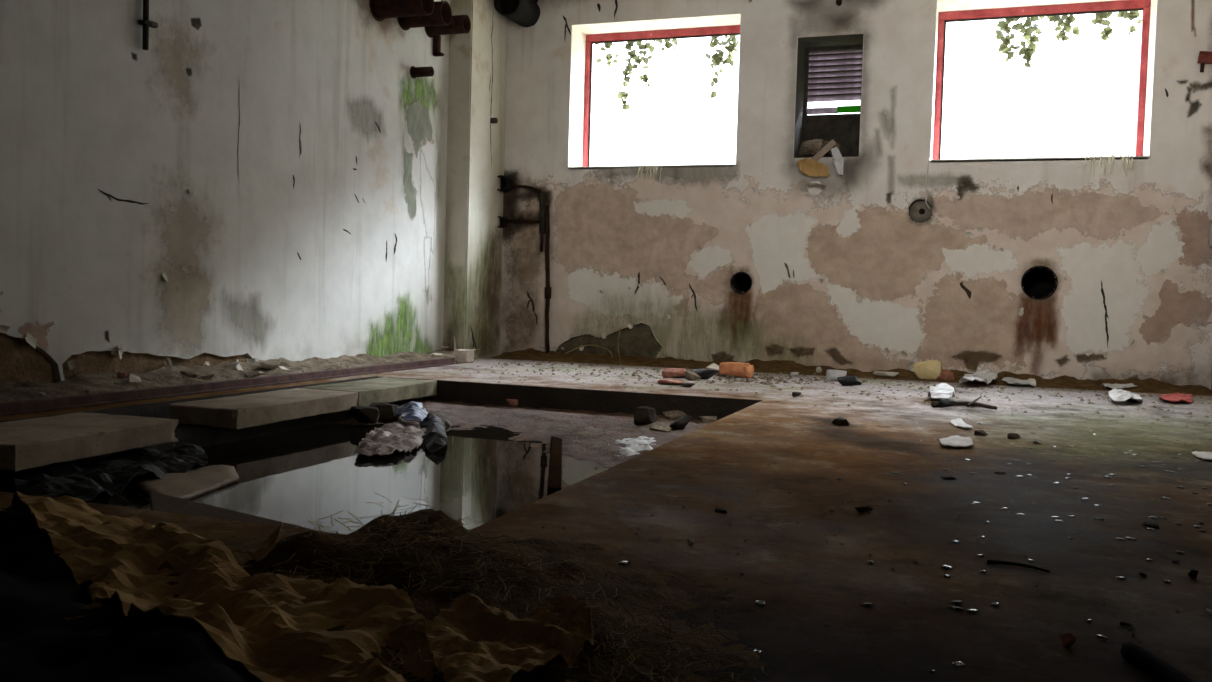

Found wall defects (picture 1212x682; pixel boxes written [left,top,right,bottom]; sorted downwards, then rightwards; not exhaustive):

crack [98,189,149,205]
peeling [503,166,1212,380]
flaking render [0,310,256,384]
damp [371,300,407,354]
rust [721,292,751,345]
rust [1018,294,1056,371]
crack [1101,281,1109,346]